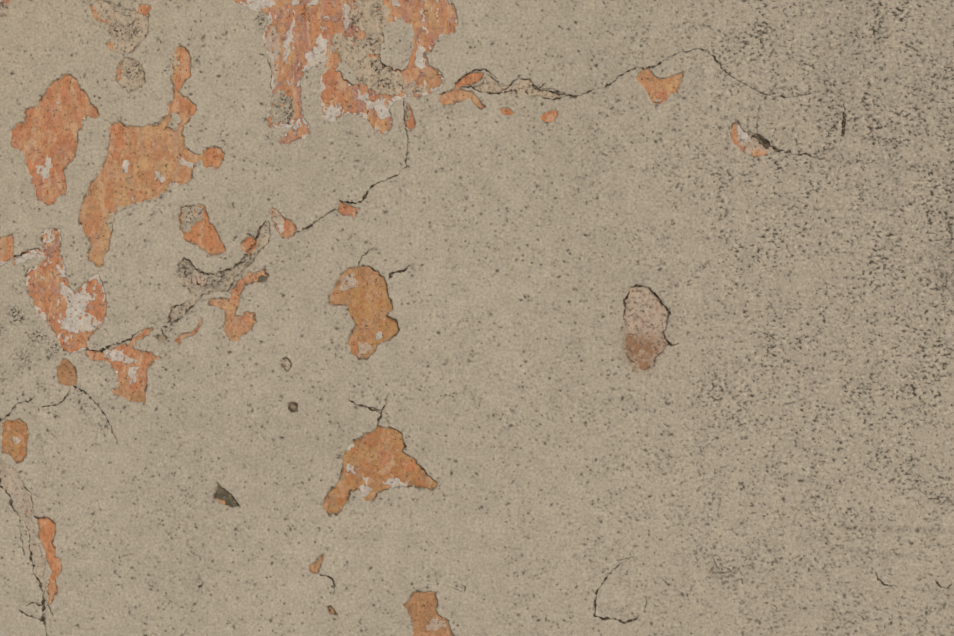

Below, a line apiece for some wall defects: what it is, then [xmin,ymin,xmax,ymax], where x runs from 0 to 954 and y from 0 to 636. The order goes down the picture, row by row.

peeling [235,0,560,145]
crack [442,48,810,100]
crack [297,54,417,232]
crack [752,124,820,160]
crack [840,108,848,136]
peeling [0,44,226,403]
flaking render [168,208,296,342]
peeling [329,266,400,360]
crack [0,386,116,438]
peeling [323,426,437,515]
crack [0,478,51,625]
peeling [404,591,453,636]